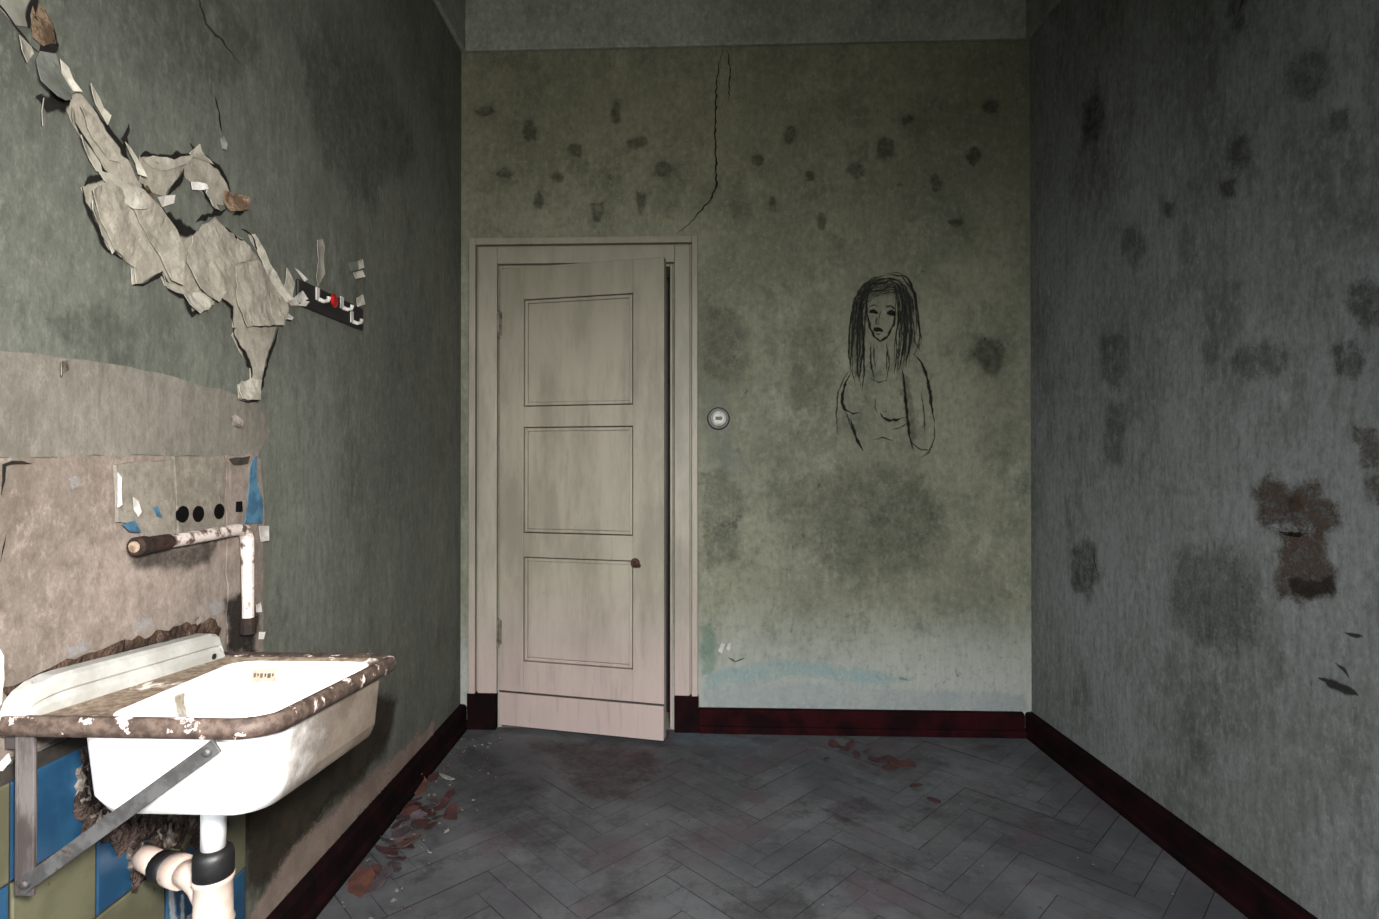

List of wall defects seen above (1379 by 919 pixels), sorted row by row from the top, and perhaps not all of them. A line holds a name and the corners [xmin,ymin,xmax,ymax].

crack [676,51,731,234]
peeling [348,259,365,279]
flaking render [0,0,325,711]
water stain [1254,475,1340,604]
flaking render [0,736,15,771]
flaking render [37,737,59,749]